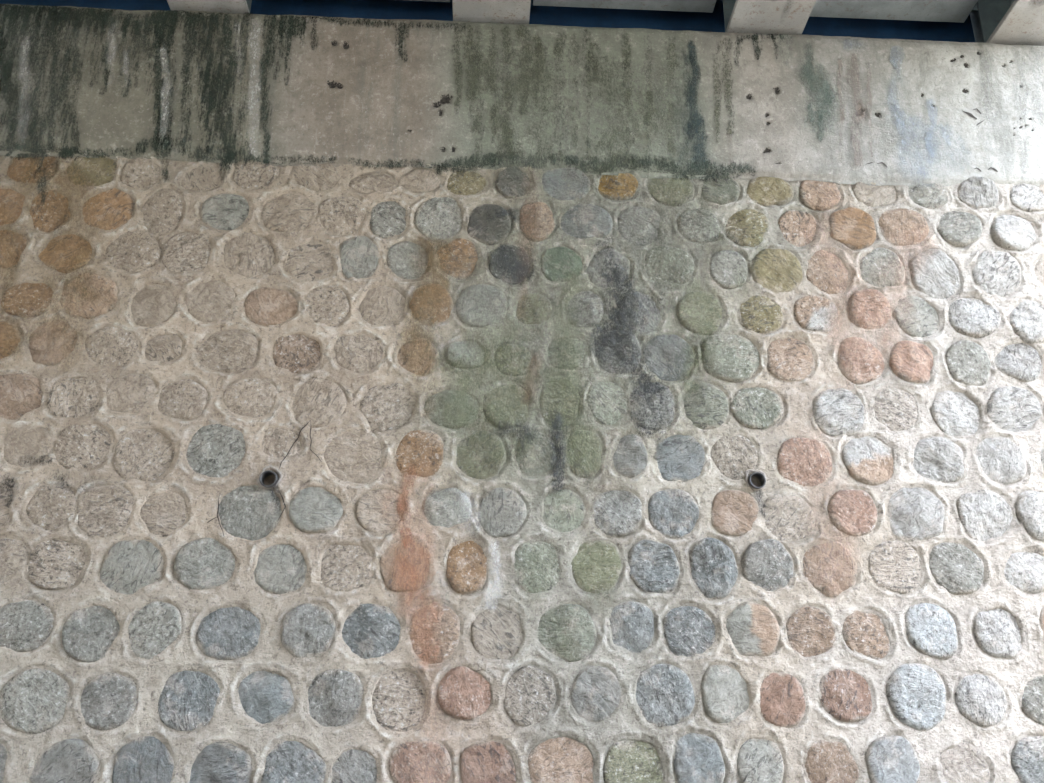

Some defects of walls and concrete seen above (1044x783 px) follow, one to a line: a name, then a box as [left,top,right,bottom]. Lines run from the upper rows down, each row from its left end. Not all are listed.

leakage [0,4,317,202]
leakage [452,26,513,155]
leakage [686,36,762,167]
leakage [590,241,675,440]
leakage [503,415,565,490]